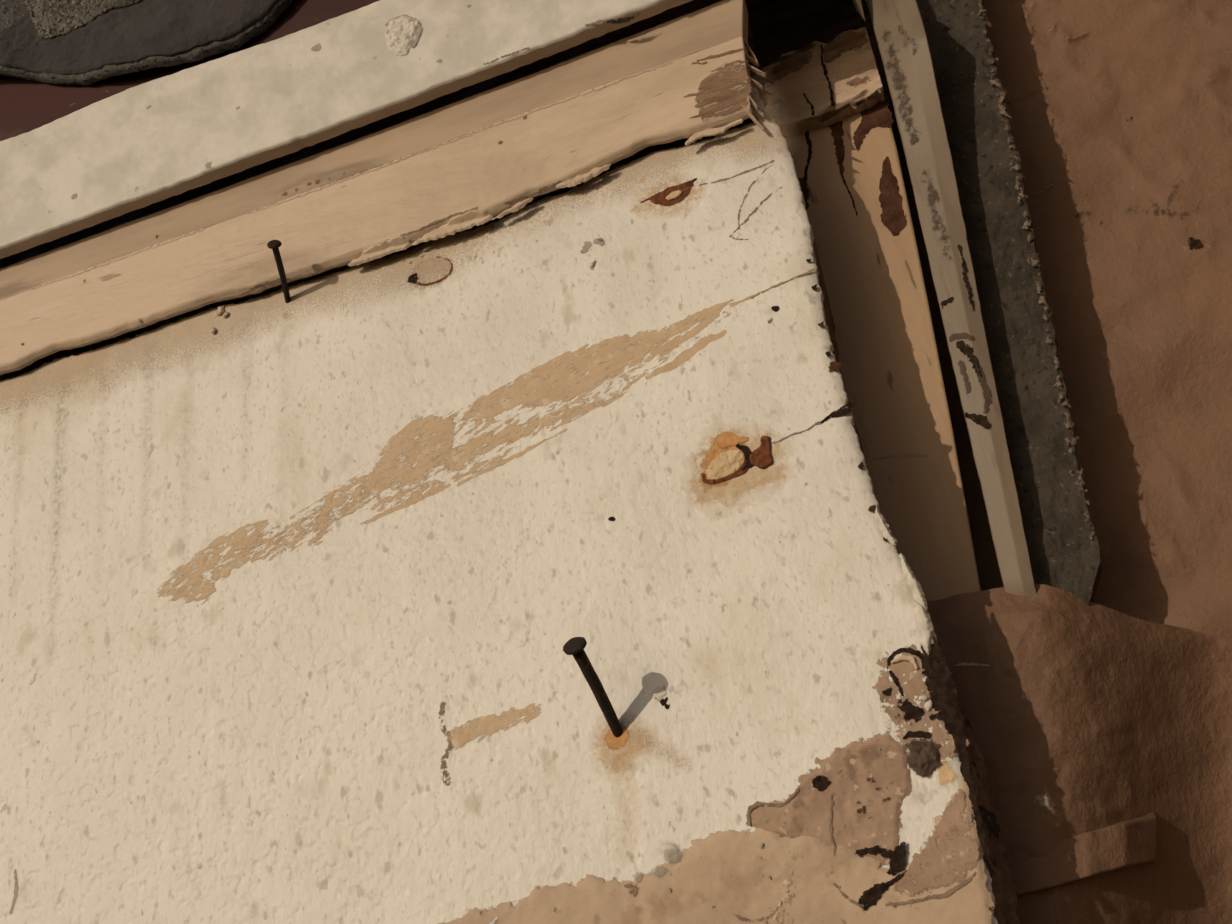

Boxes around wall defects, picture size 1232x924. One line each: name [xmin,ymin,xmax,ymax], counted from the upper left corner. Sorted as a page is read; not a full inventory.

peeling [348,164,611,270]
corrosion [634,178,697,212]
crack [700,160,781,240]
peeling [798,131,813,209]
peeling [829,95,894,216]
peeling [879,156,907,236]
corrosion [403,254,453,287]
peeling [158,313,701,604]
corrosion [691,429,784,504]
peeling [447,703,541,750]
corrosion [600,724,647,771]
peeling [746,505,980,897]